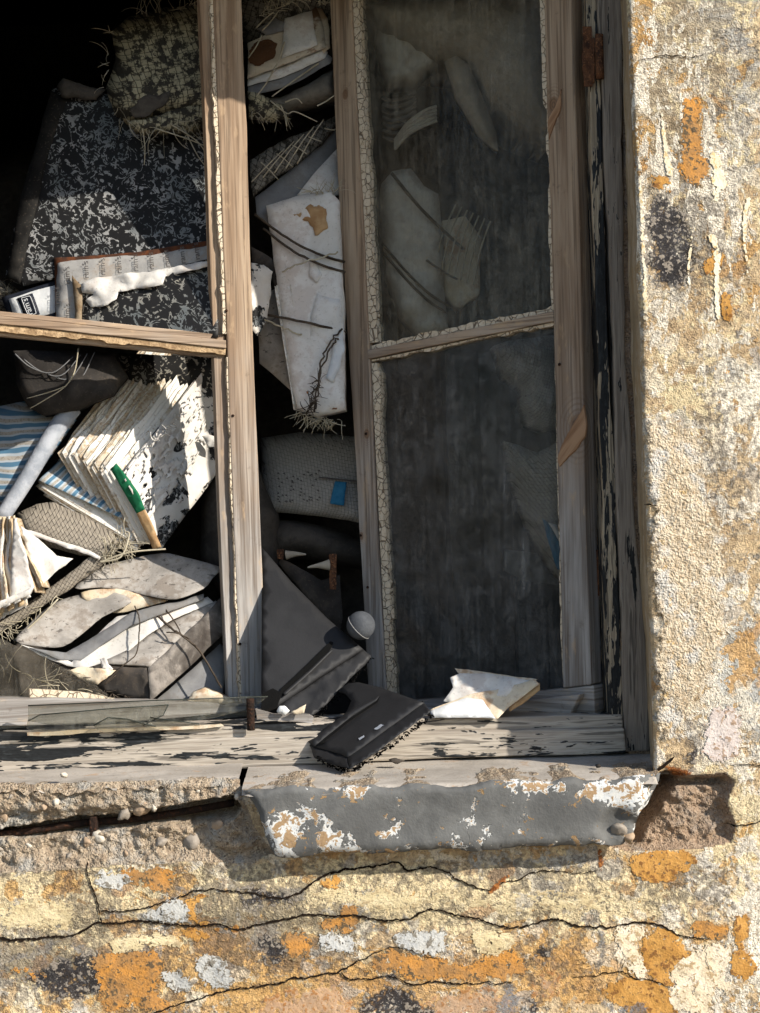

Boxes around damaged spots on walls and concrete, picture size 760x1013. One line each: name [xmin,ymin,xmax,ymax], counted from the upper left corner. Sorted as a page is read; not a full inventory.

spalling [609,705,743,884]
spalling [0,763,273,1013]
crack [0,861,708,942]
crack [154,946,511,1013]
crack [579,971,669,988]